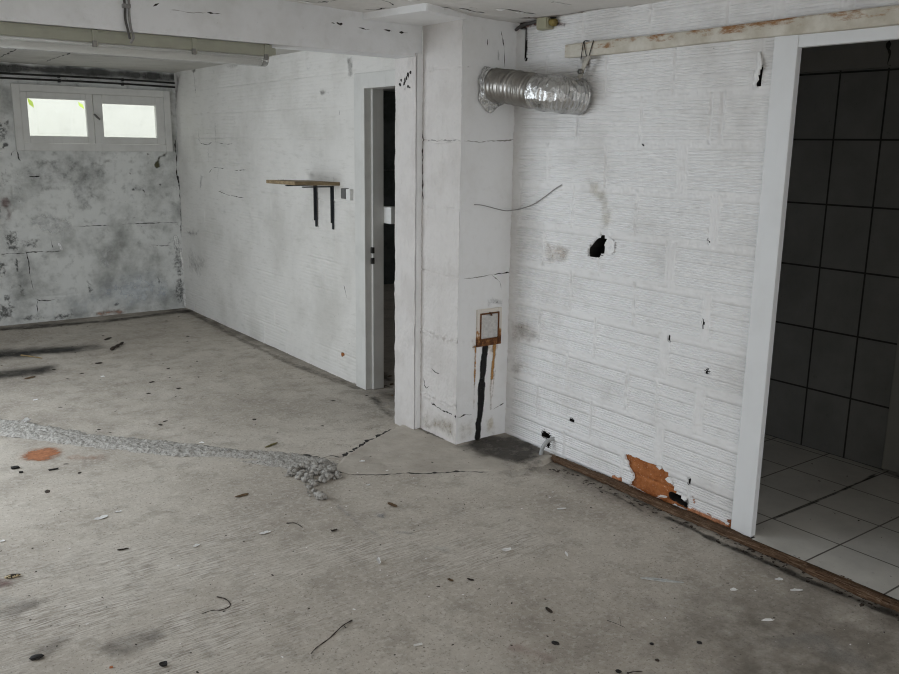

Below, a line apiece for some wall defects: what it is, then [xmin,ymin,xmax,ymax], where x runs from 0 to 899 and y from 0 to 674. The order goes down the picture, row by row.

crack [288,0,420,34]
crack [444,2,571,14]
spalling [752,52,764,88]
crack [884,40,892,66]
crack [422,134,513,197]
spalling [587,234,615,259]
leakage [466,346,540,462]
crack [303,429,482,475]
peeling [612,453,731,528]